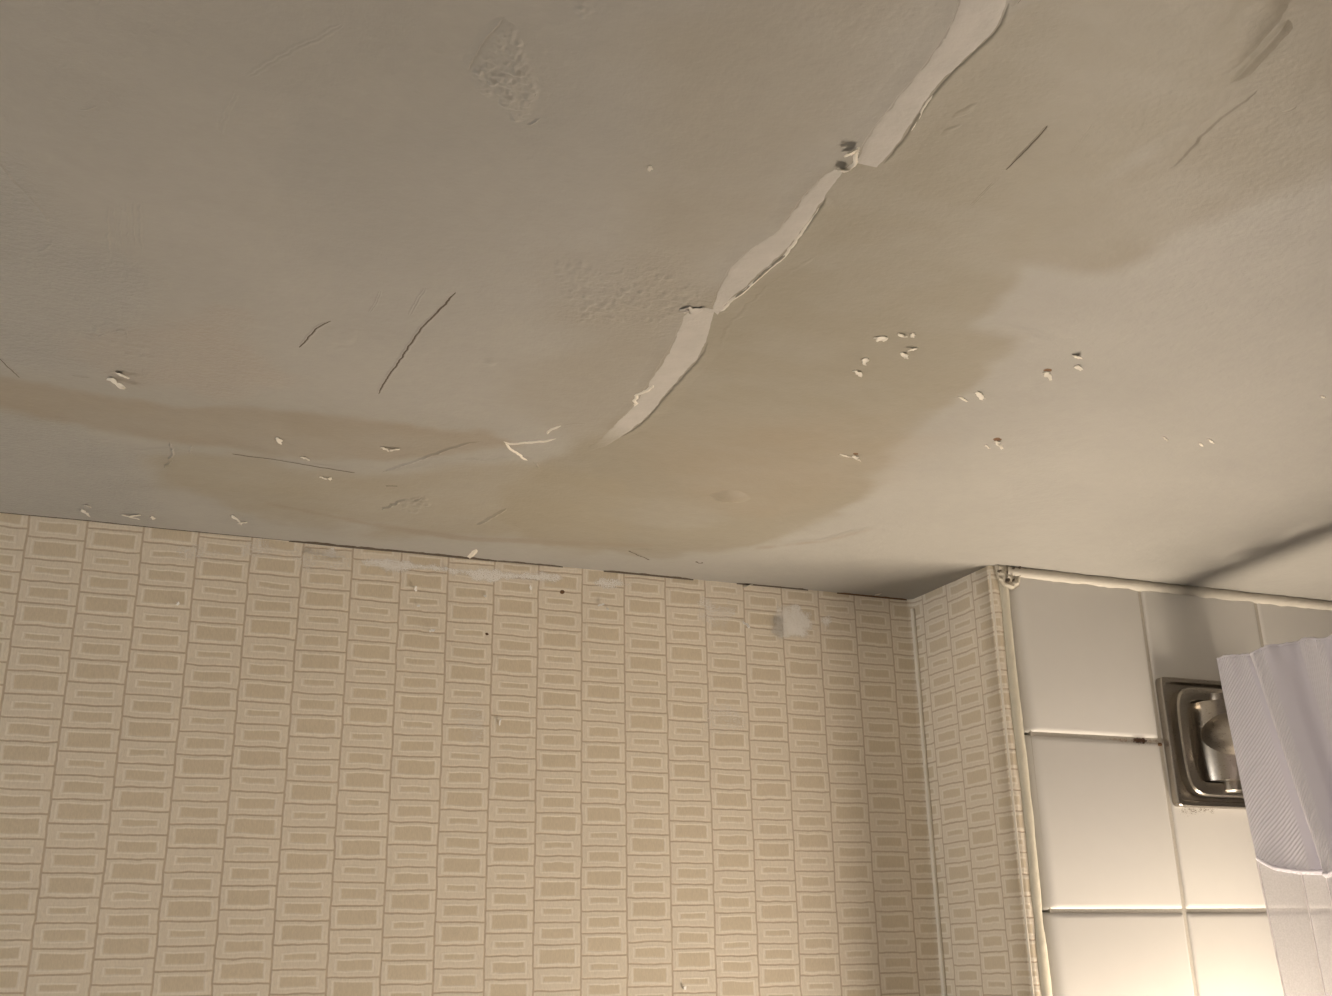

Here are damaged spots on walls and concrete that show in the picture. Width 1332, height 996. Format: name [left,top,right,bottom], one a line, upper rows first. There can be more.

crack [377,292,456,395]
water stain [0,0,1332,562]
peeling [589,0,1032,450]